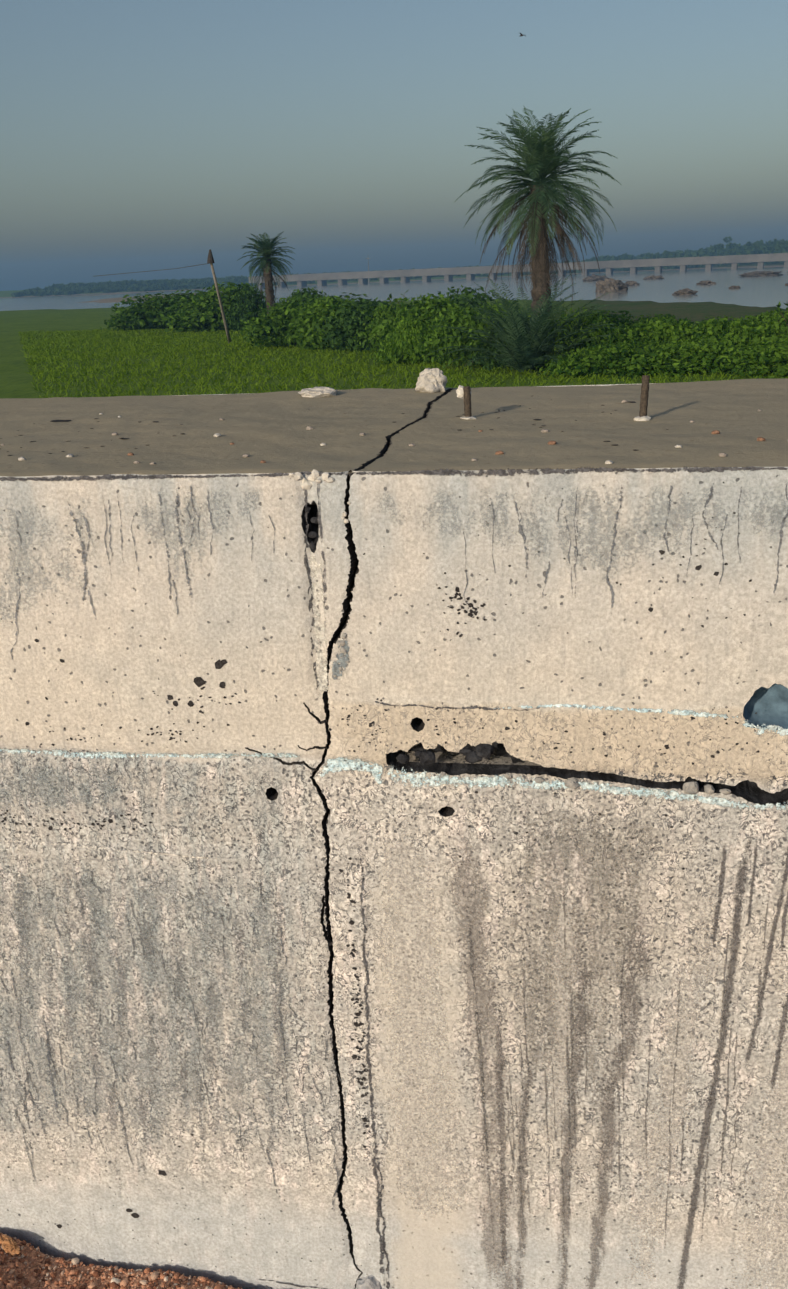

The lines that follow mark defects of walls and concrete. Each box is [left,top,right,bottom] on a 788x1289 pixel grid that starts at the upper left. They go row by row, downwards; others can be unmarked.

damp [104,501,139,572]
spalling [289,469,335,553]
damp [0,466,788,499]
damp [720,490,742,581]
crack [245,388,453,1289]
spalling [386,708,788,806]
damp [0,941,45,1179]
damp [42,1010,106,1153]
damp [277,998,346,1162]
damp [452,854,591,1289]
damp [588,926,650,1287]
damp [665,845,788,1289]